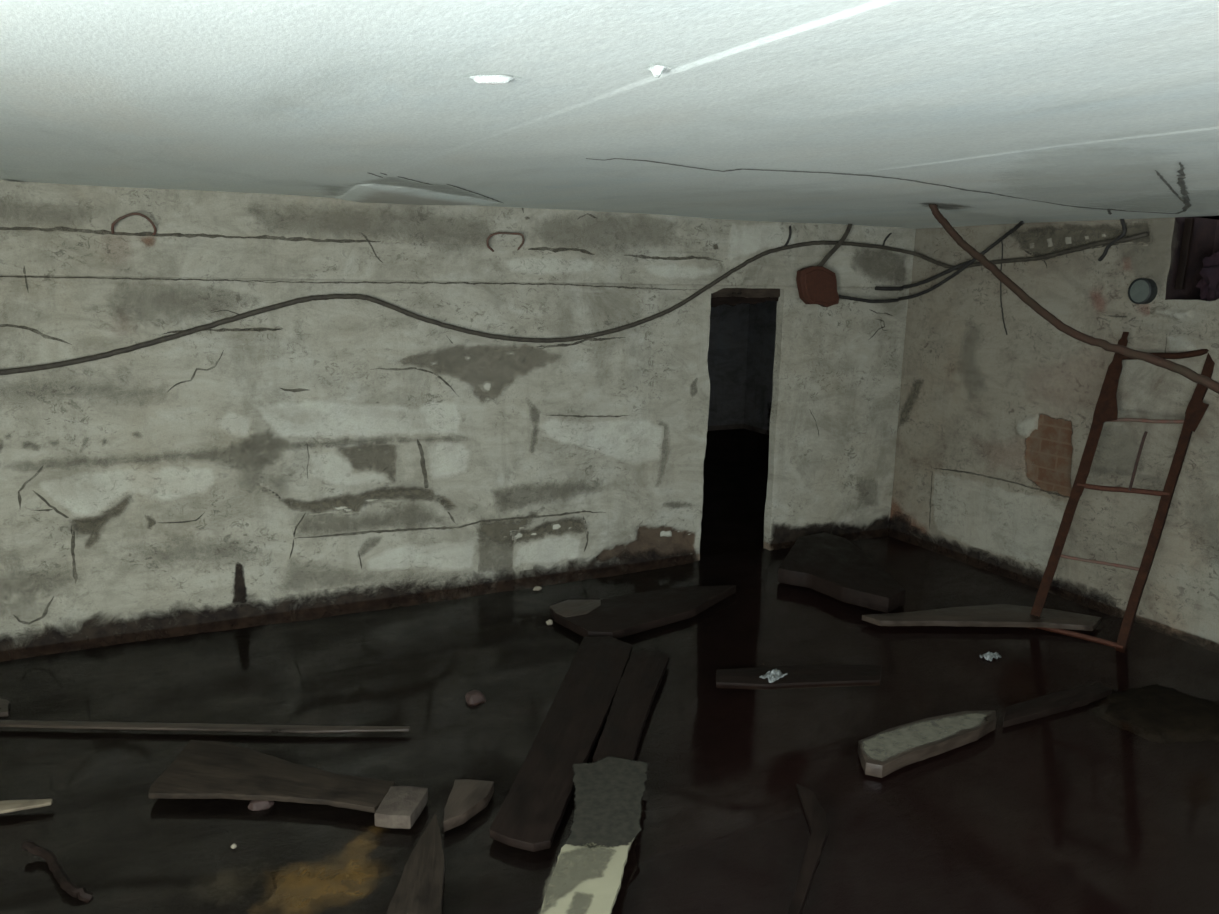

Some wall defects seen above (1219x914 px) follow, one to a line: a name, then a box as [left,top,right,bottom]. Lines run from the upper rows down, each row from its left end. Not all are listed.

crack [586,158,1192,215]
crack [14,466,76,624]
water stain [0,484,697,662]
crack [289,439,606,568]
water stain [770,515,1219,654]
flaking render [929,412,1073,575]